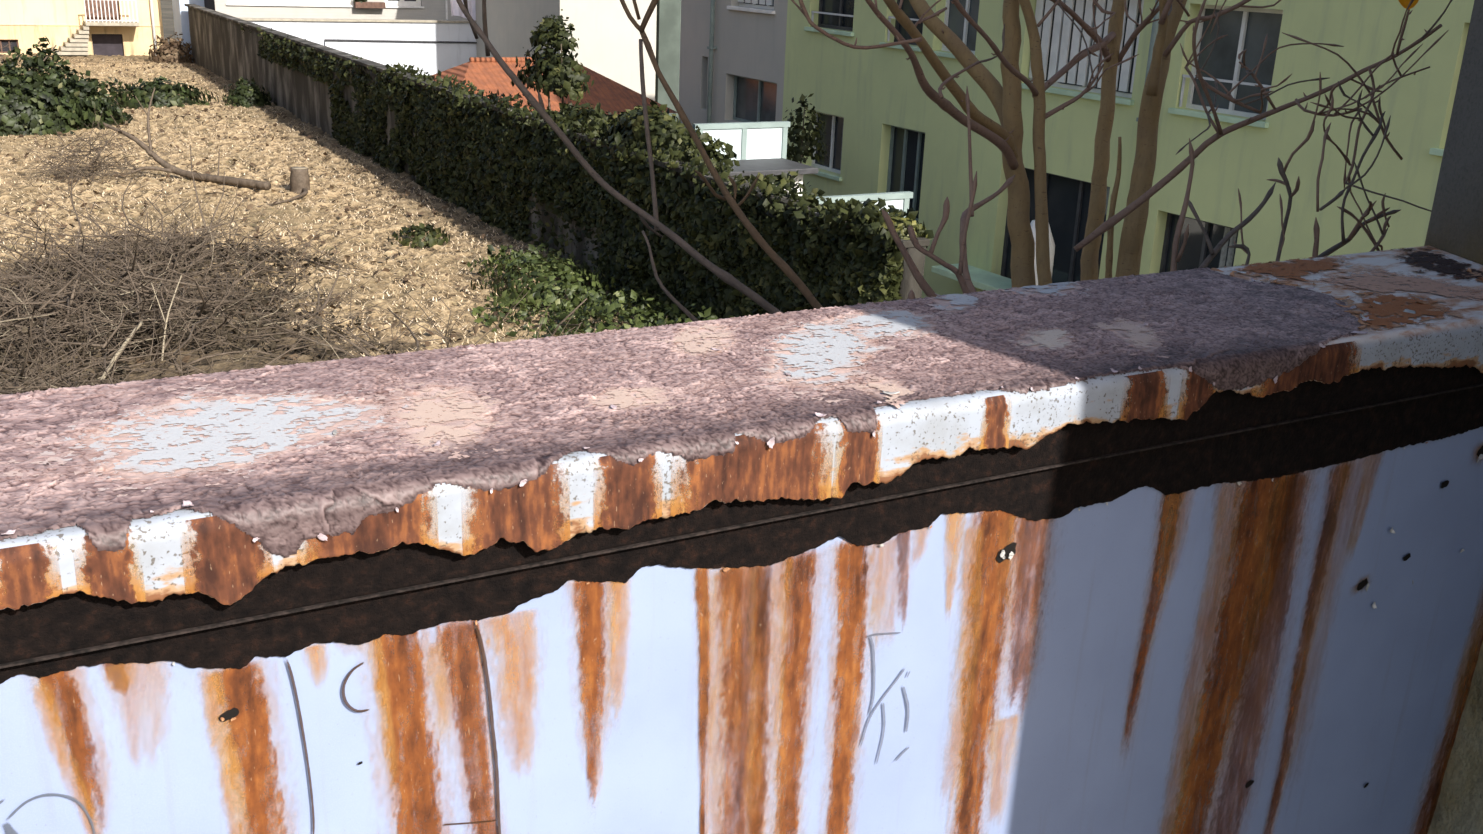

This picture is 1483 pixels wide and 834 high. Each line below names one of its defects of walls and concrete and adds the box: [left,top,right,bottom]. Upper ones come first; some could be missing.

peeling [654,281,1101,417]
peeling [1092,315,1169,370]
peeling [1391,247,1483,282]
corrosion [0,533,146,610]
corrosion [184,516,274,605]
peeling [0,381,1483,684]
corrosion [40,671,103,831]
corrosion [207,664,286,834]
corrosion [373,615,535,834]
corrosion [696,552,816,834]
corrosion [827,543,868,834]
corrosion [947,510,1049,834]